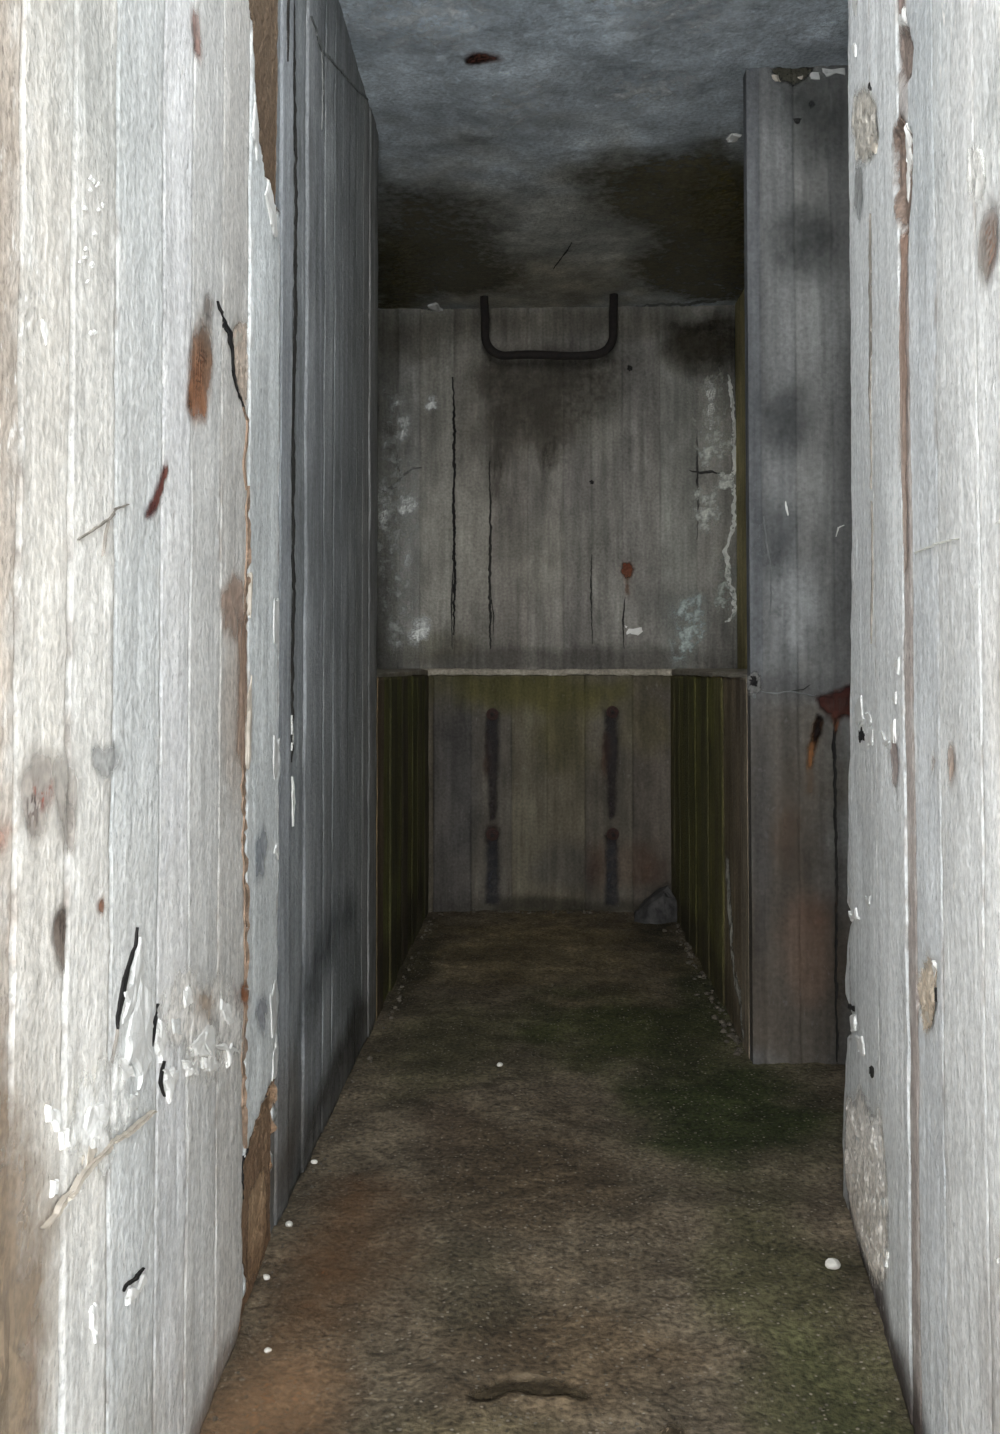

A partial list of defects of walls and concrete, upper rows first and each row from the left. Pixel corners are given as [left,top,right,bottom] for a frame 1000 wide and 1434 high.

rust [465,53,499,65]
damp [378,185,517,309]
rust [188,295,213,419]
crack [286,0,369,762]
damp [584,133,744,659]
rust [146,464,169,517]
damp [377,395,430,649]
crack [216,301,253,1148]
rust [807,685,850,768]
peeling [164,971,249,1079]
spalling [238,979,278,1337]
crack [122,1267,147,1306]